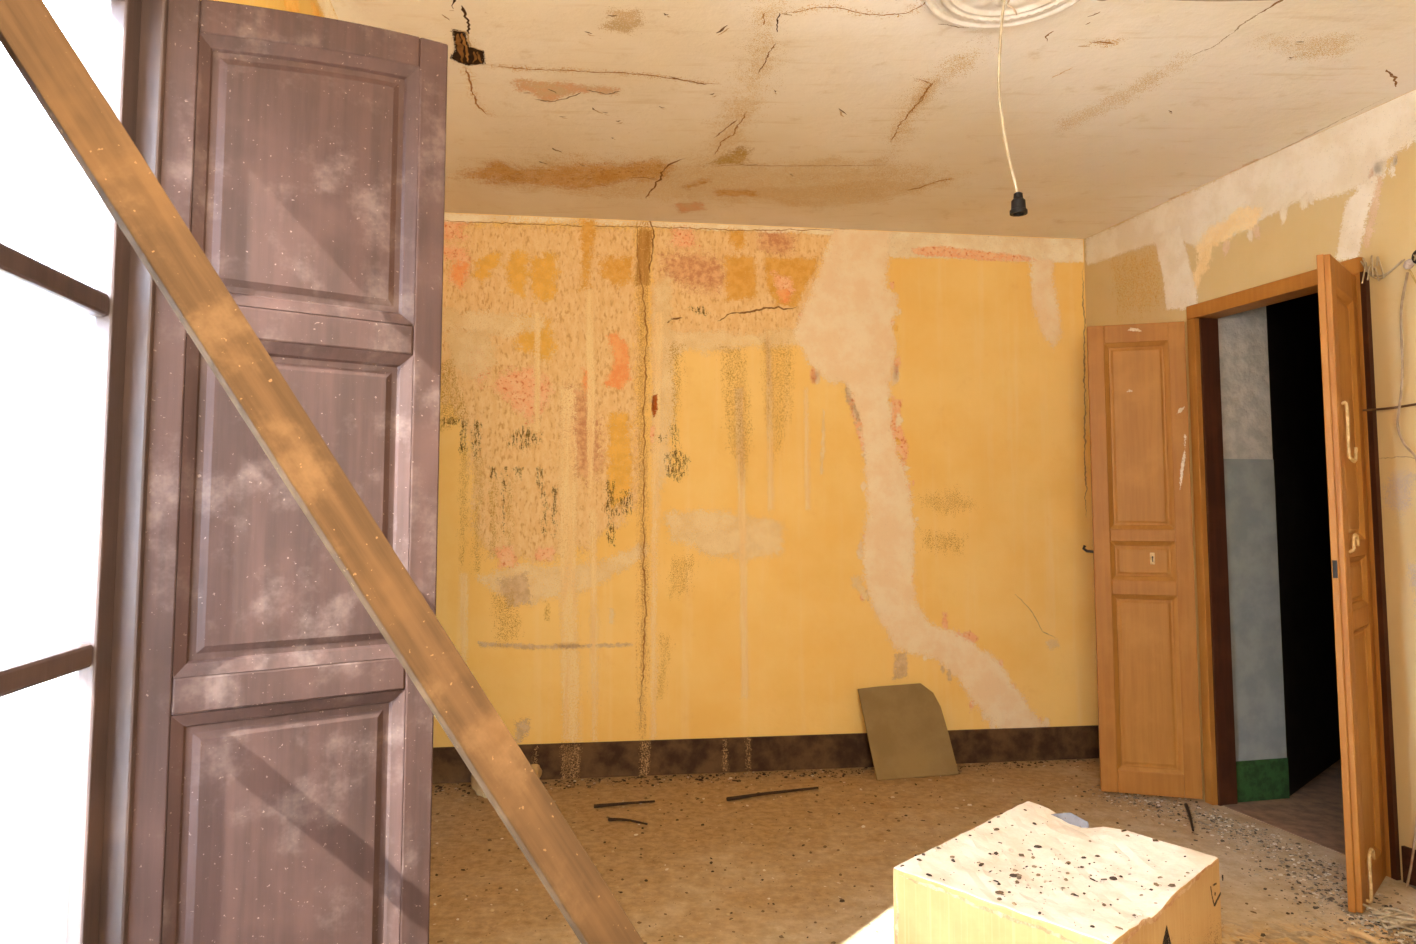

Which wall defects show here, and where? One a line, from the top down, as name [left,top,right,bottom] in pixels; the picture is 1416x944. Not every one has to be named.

peeling [317,0,338,20]
crack [443,0,935,197]
crack [756,0,969,73]
crack [910,177,956,190]
peeling [887,90,1416,267]
peeling [441,213,848,566]
damp [440,0,997,779]